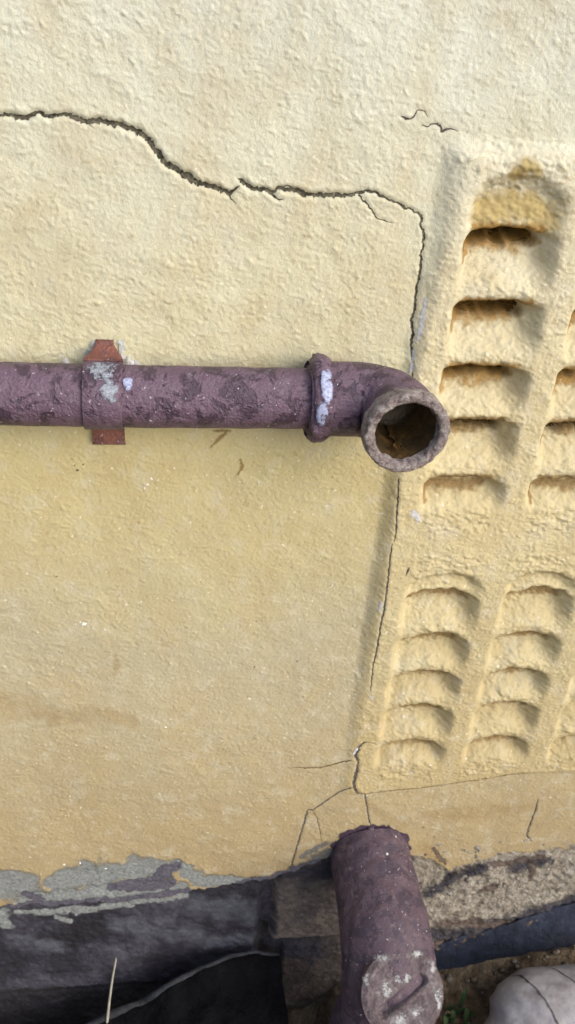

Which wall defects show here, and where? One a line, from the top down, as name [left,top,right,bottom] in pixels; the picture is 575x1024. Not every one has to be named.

crack [401,109,457,132]
crack [0,110,425,377]
crack [370,478,410,691]
crack [290,742,513,869]
crack [526,800,538,841]
peeling [0,854,324,929]